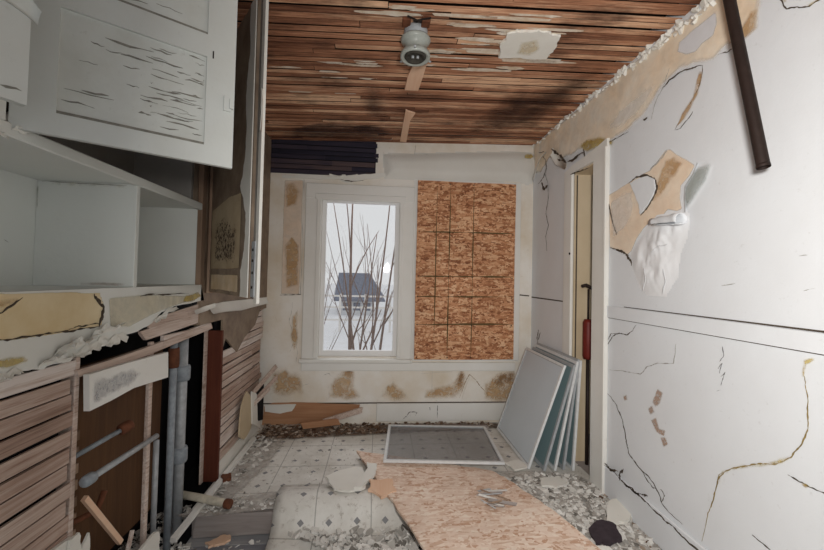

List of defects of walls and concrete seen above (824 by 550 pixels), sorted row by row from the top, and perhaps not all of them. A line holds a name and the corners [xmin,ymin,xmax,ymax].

spalling [737,0,758,37]
spalling [532,0,732,190]
spalling [270,137,385,295]
crack [538,151,549,249]
peeling [609,150,698,297]
spalling [0,292,278,550]
peeling [460,374,489,398]
crack [614,345,676,374]
peeling [649,391,667,446]
crack [604,359,824,550]